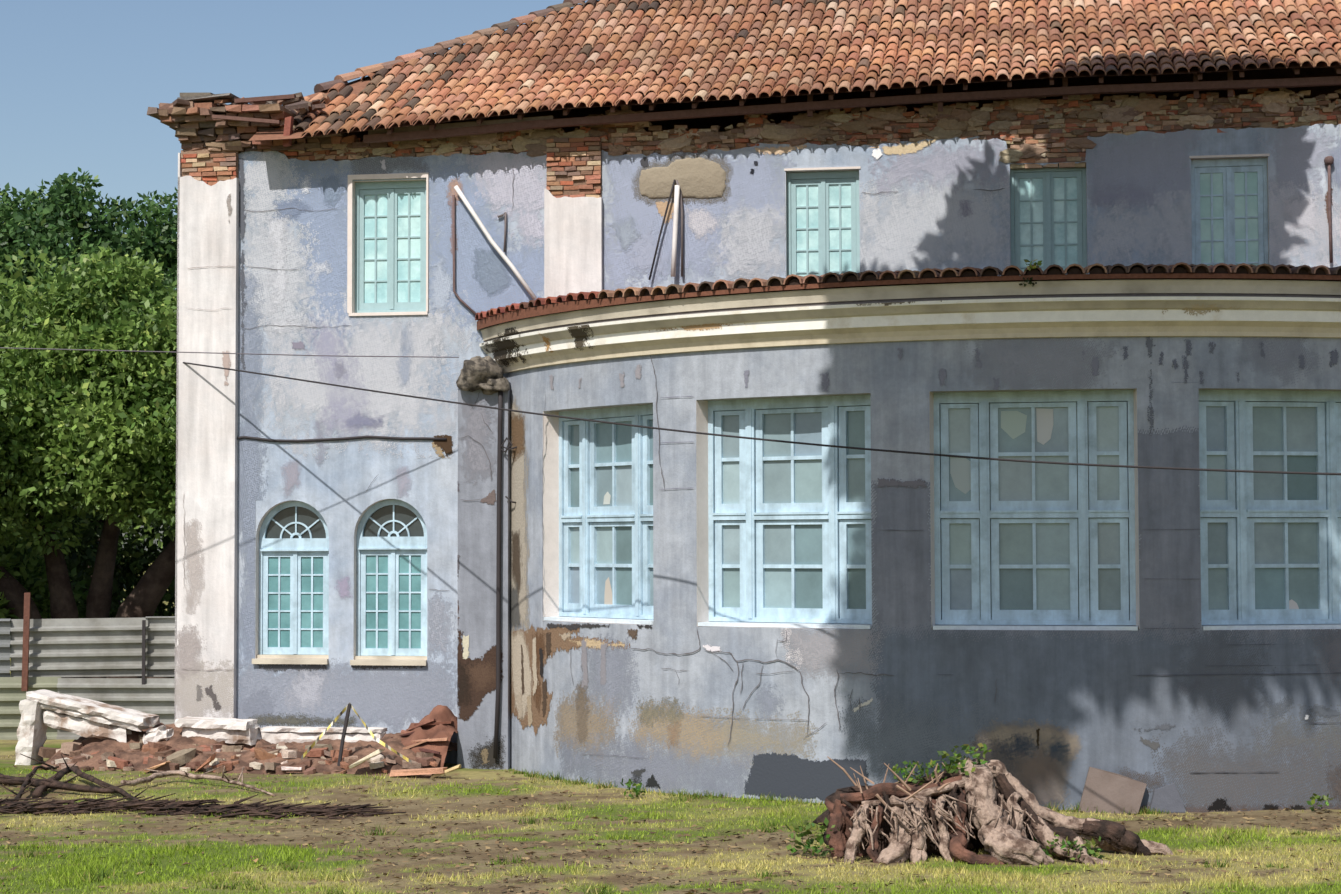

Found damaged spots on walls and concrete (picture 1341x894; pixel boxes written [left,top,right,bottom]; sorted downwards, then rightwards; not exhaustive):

flaking render [546,137,602,198]
peeling [754,144,807,155]
peeling [872,139,936,160]
flaking render [1009,123,1086,170]
peeling [457,398,652,736]
crack [631,630,894,744]